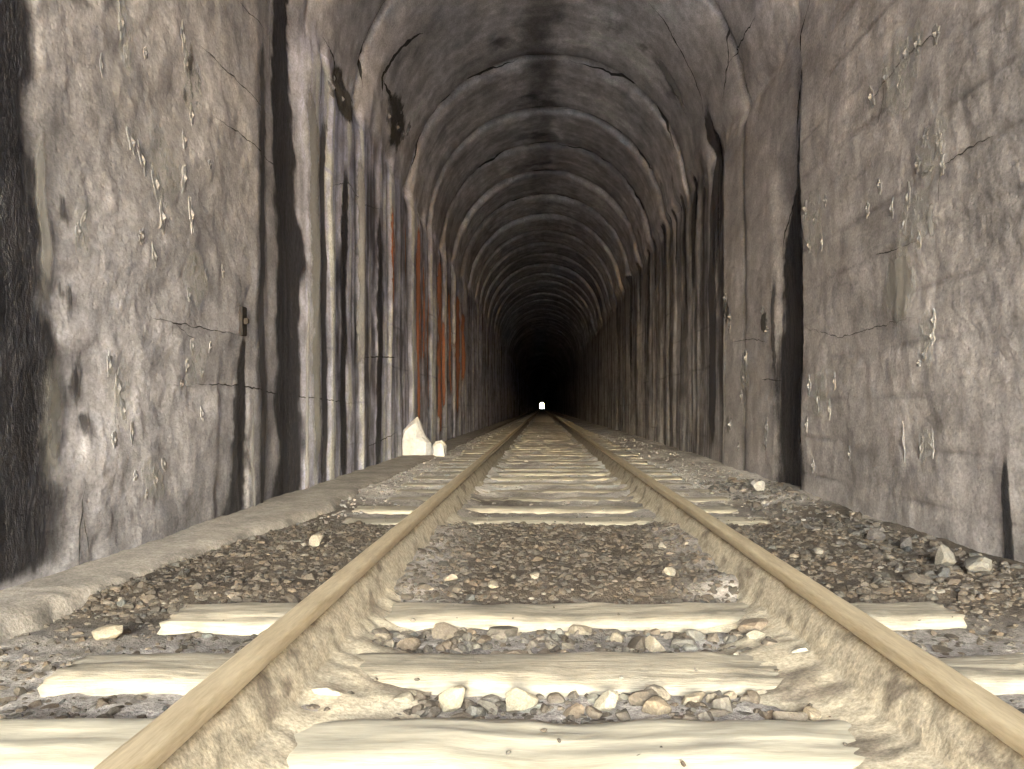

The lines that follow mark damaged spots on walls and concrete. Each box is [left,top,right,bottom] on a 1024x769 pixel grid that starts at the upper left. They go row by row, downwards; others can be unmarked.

spalling [327,67,355,123]
crack [319,2,423,122]
spalling [386,94,411,151]
crack [938,136,993,200]
leakage [0,0,90,584]
crack [147,315,233,339]
leakage [223,0,383,516]
rust [391,214,466,431]
leakage [771,134,805,490]
crack [807,317,911,338]